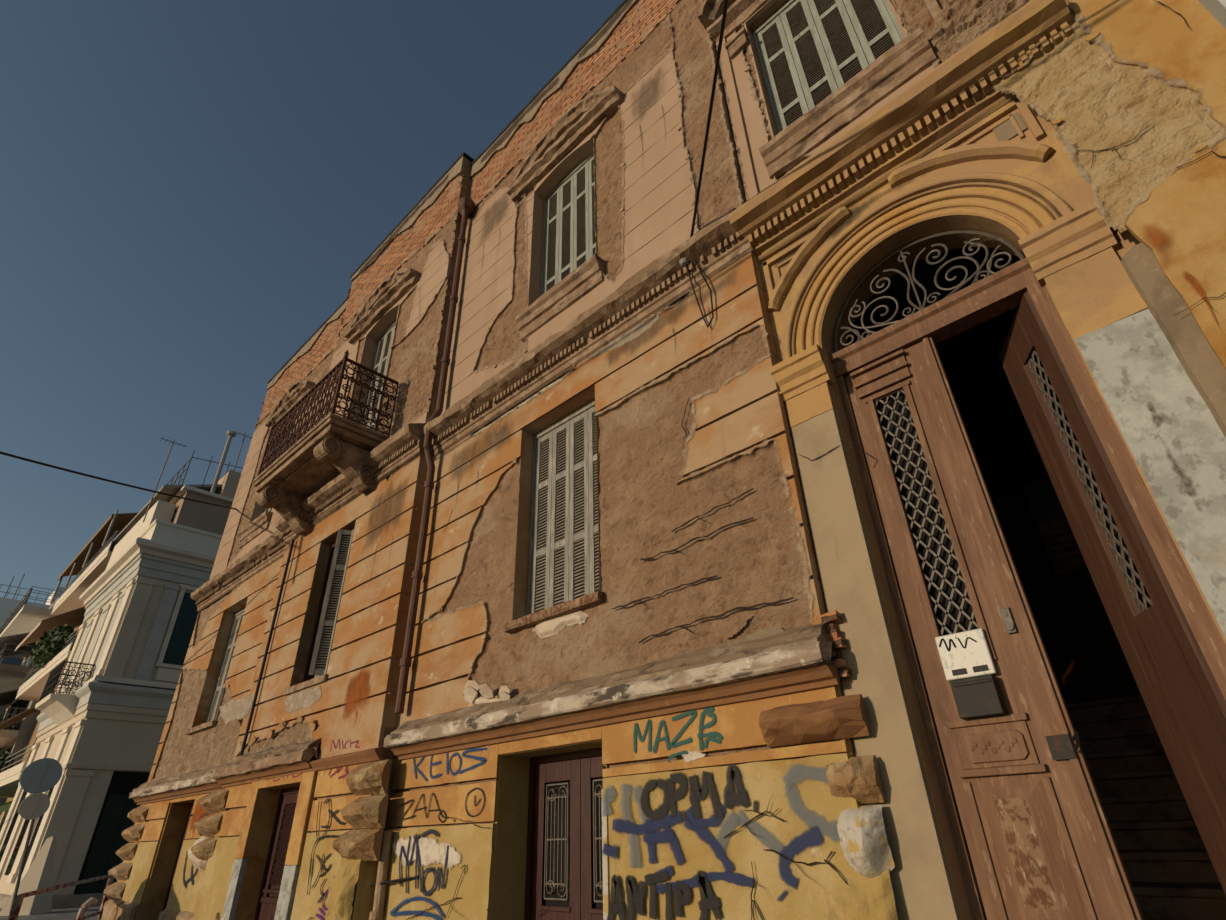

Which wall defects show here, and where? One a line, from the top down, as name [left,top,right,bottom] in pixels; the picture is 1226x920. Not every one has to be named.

flaking render [734,23,773,142]
spalling [890,0,1030,67]
flaking render [993,0,1226,233]
flaking render [227,0,743,565]
rust [1184,272,1219,326]
flaking render [421,324,852,704]
flaking render [151,668,321,781]
rust [344,672,369,724]